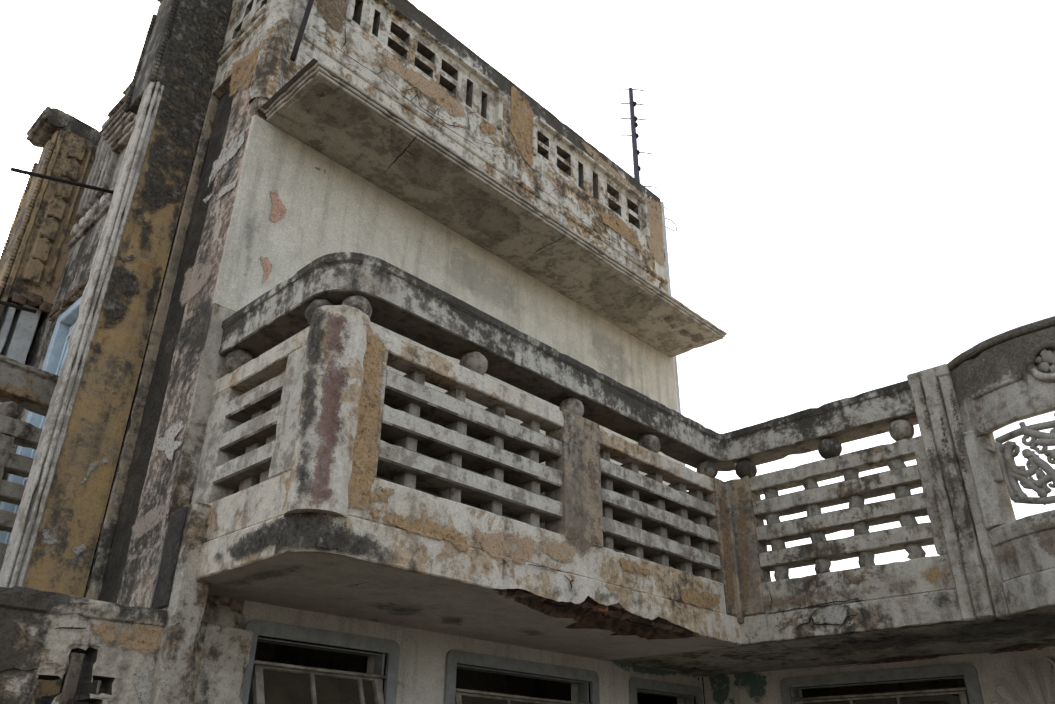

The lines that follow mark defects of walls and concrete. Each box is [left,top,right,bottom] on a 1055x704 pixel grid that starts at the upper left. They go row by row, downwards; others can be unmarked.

leakage [100,0,233,358]
peeling [270,190,287,222]
crack [311,28,655,297]
peeling [509,86,535,166]
peeling [582,142,665,267]
peeling [260,256,272,284]
corrosion [309,312,351,507]
peeling [347,329,577,570]
spalling [495,589,692,640]
peeling [620,558,651,578]